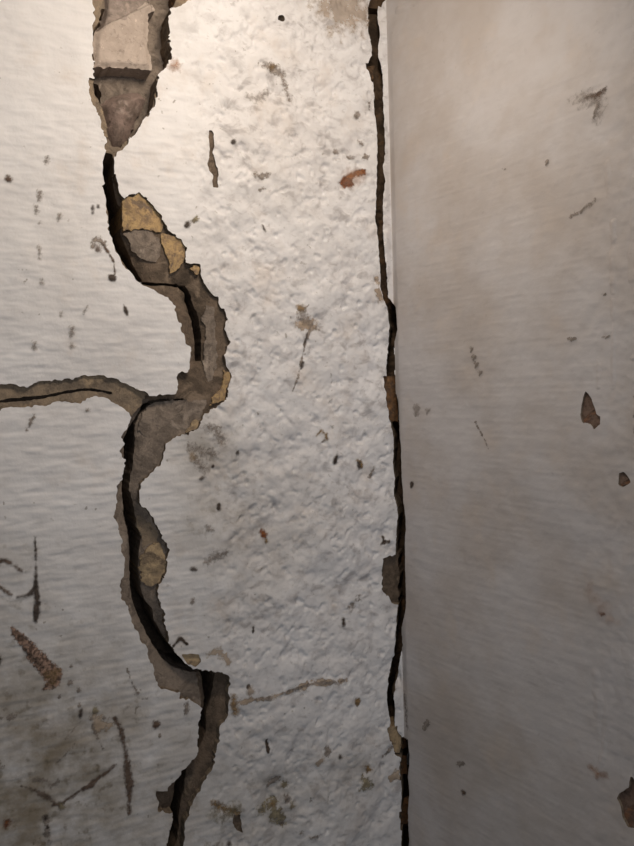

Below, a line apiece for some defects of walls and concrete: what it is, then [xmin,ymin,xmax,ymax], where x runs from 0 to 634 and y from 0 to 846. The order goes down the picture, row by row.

spalling [368,0,385,15]
crack [0,388,111,403]
spalling [0,0,231,846]
crack [366,14,409,846]
peeling [582,392,600,428]
crack [122,499,130,536]
crack [129,576,188,654]
peeling [619,777,634,827]